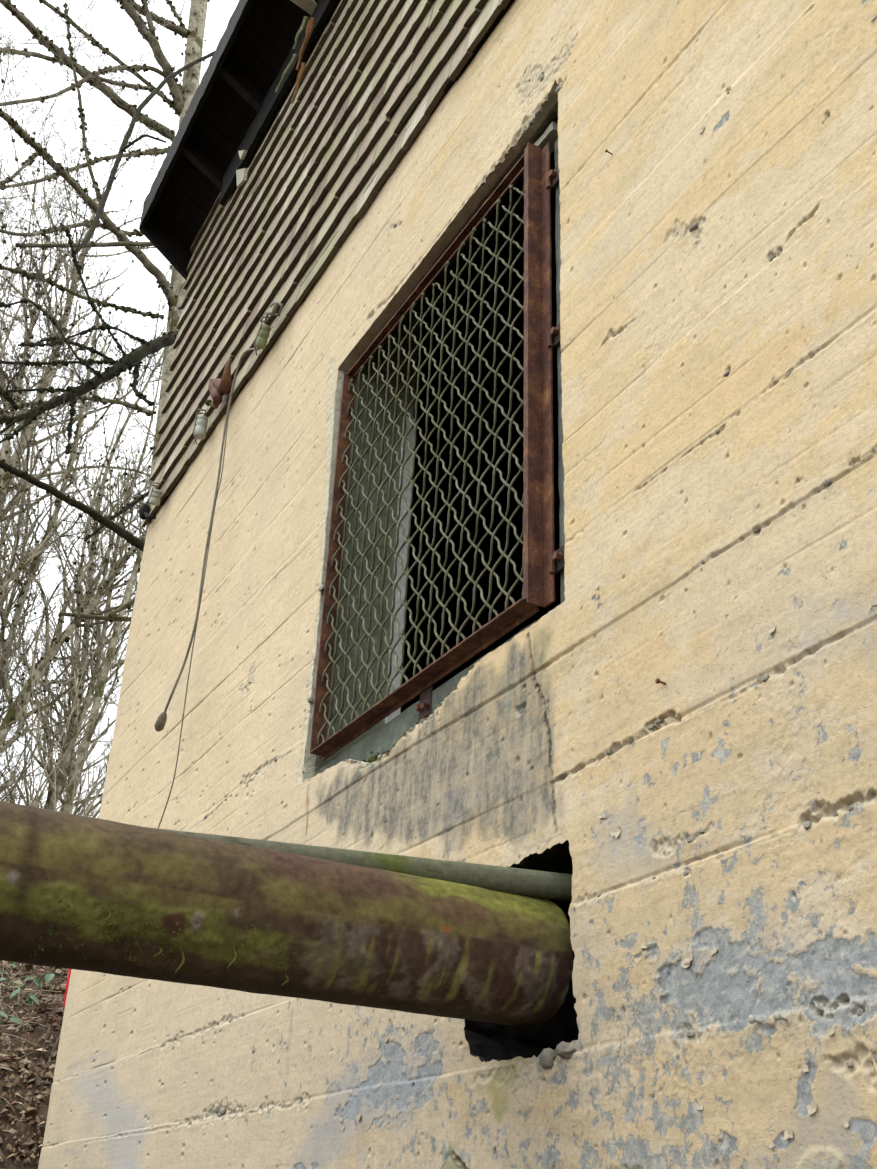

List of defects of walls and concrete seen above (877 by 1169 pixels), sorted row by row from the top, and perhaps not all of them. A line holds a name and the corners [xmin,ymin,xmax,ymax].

spalling [448,31,578,223]
spalling [662,216,706,254]
crack [525,633,568,832]
spalling [794,789,877,831]
peeling [636,927,877,1061]
spalling [793,1041,877,1115]
peeling [769,1127,796,1148]
peeling [843,1120,877,1146]
crack [451,1151,467,1169]